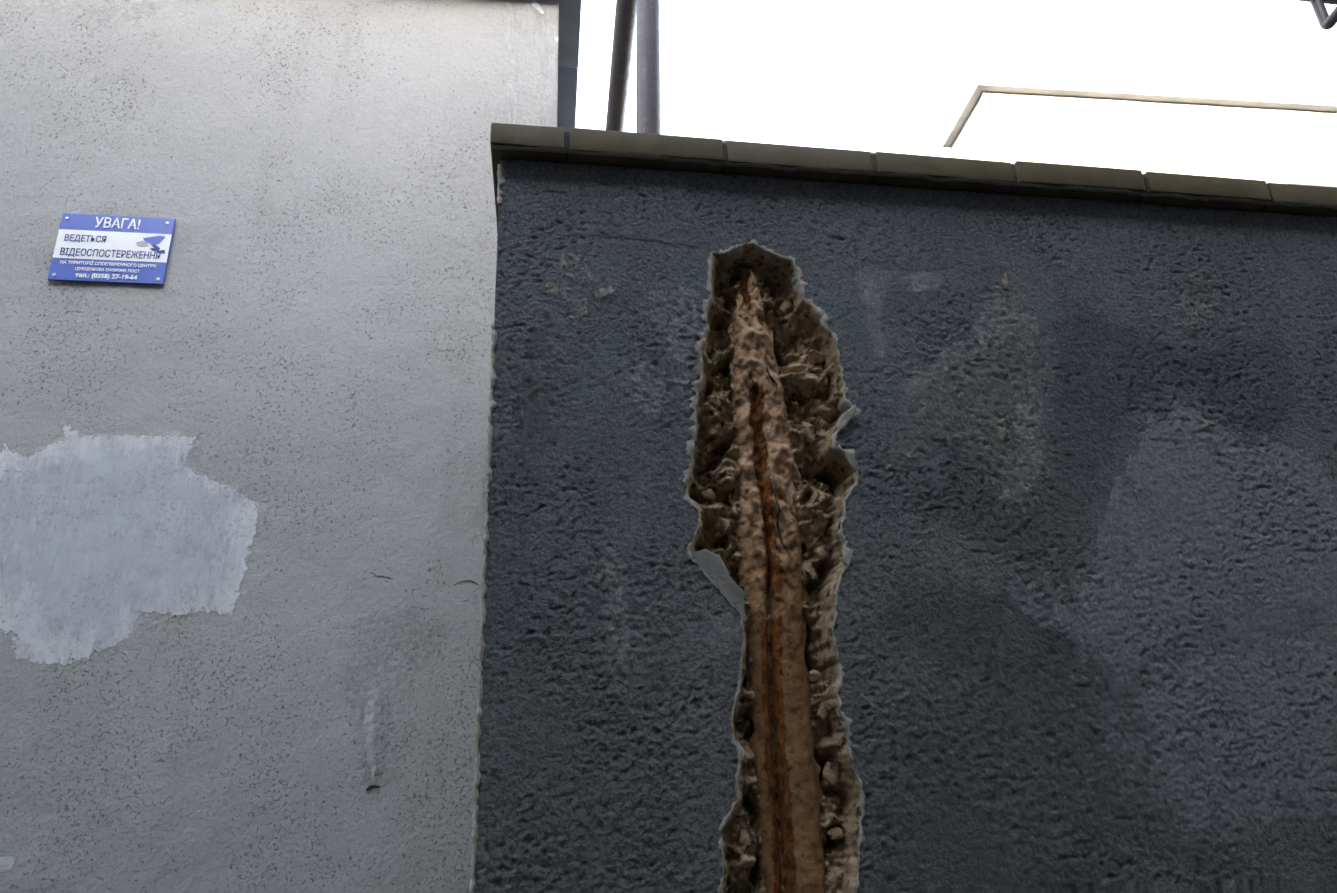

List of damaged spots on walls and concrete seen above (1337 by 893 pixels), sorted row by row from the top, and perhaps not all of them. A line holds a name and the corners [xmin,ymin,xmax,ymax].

rust [740,270,751,311]
rust [746,382,784,598]
spalling [682,239,866,893]
rust [761,615,796,893]